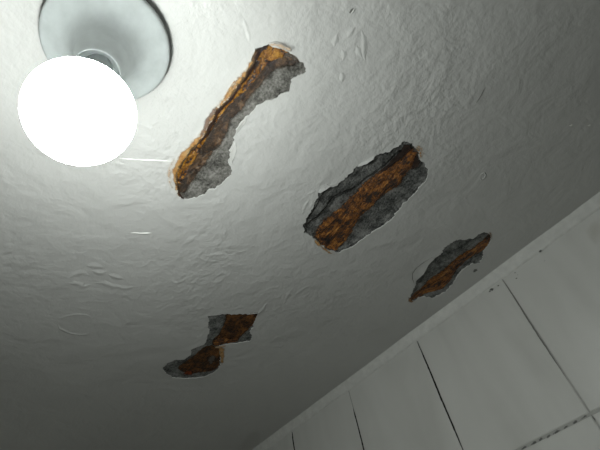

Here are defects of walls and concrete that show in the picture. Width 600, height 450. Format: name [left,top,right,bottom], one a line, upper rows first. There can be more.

corrosion [168,62,253,190]
spalling [175,41,306,199]
spalling [303,141,428,253]
spalling [410,232,491,301]
spalling [163,304,266,378]